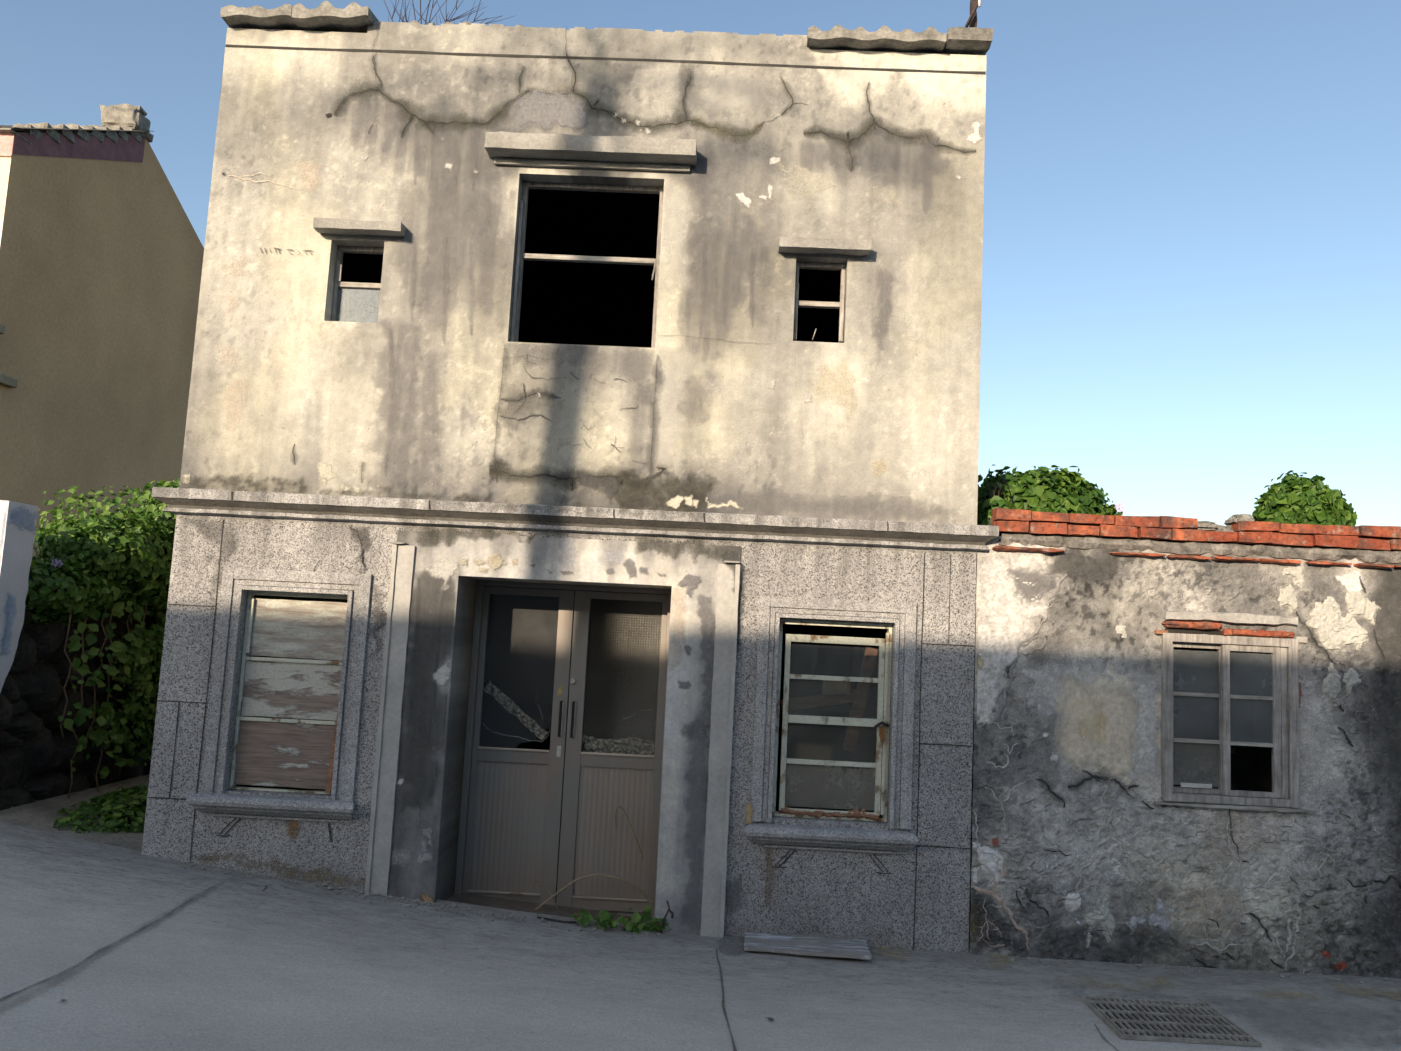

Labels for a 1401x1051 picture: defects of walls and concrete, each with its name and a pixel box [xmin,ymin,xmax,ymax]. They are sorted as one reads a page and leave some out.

crack [333,21,976,172]
crack [489,335,764,490]
peeling [667,495,739,509]
damp [401,570,455,807]
damp [682,595,716,927]
damp [723,553,744,652]
peeling [977,545,1048,724]
crack [971,555,1071,951]
crack [1139,818,1335,971]
crack [1228,809,1250,863]
peeling [1335,570,1381,625]